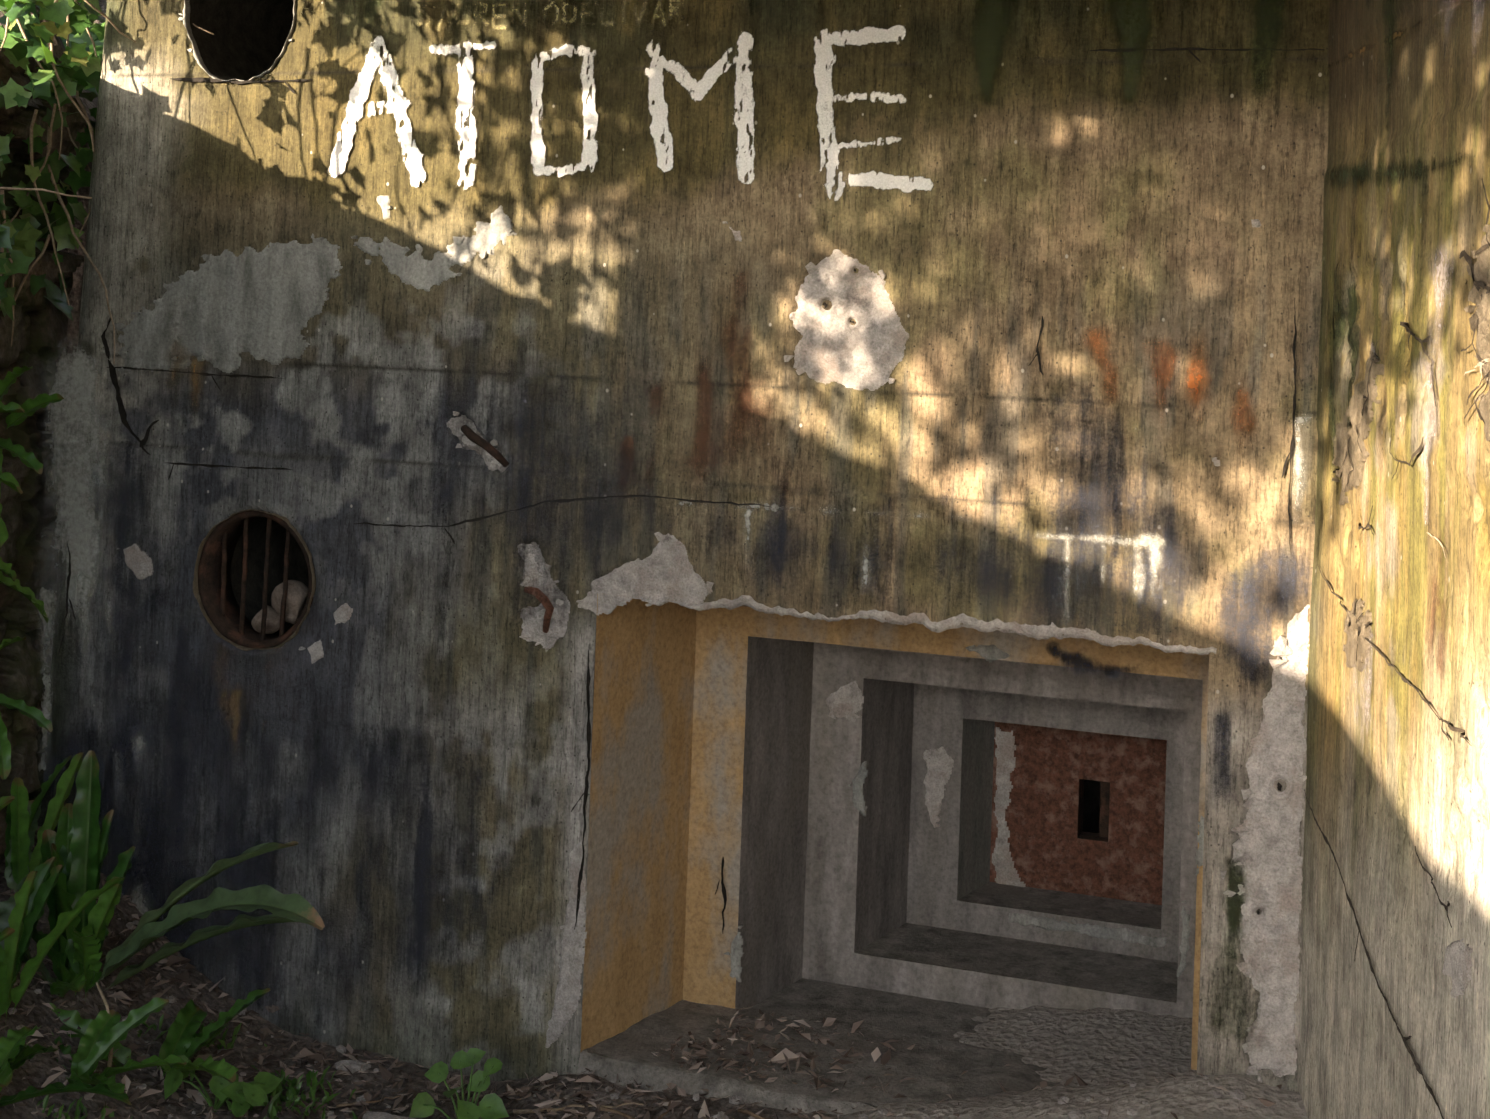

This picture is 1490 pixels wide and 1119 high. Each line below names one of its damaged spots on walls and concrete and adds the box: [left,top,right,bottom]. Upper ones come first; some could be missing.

spalling [377,196,392,219]
crack [101,318,292,480]
peeling [114,205,517,373]
spalling [784,249,909,391]
crack [1340,179,1490,535]
spalling [517,532,1217,663]
spalling [1220,605,1310,1082]
crack [1304,790,1444,1119]
crack [1415,849,1452,928]